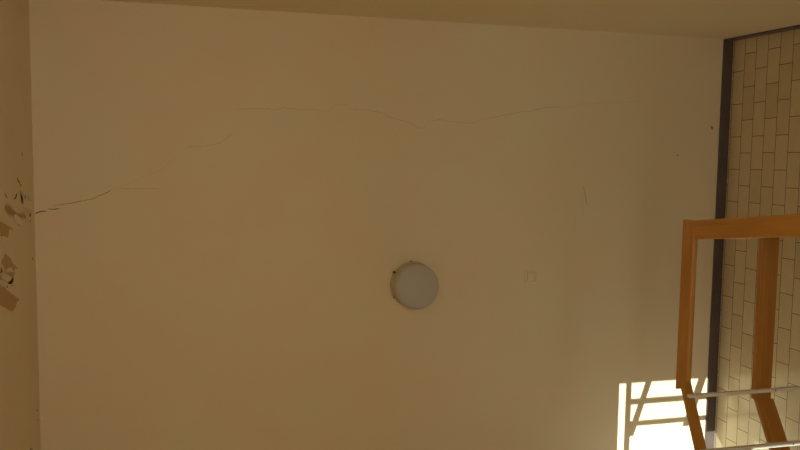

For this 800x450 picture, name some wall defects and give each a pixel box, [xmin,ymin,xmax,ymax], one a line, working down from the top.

peeling [0,254,20,312]